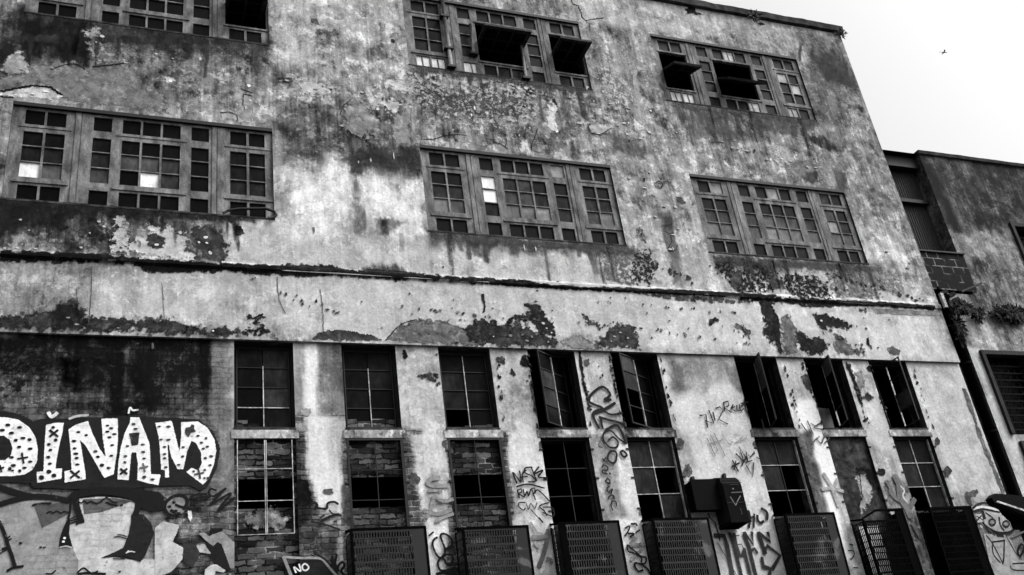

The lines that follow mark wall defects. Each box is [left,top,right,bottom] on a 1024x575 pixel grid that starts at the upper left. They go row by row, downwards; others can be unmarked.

peeling [0,26,176,115]
water stain [349,99,423,247]
peeling [89,215,245,263]
water stain [0,211,936,311]
water stain [0,298,271,410]
peeling [312,227,956,448]